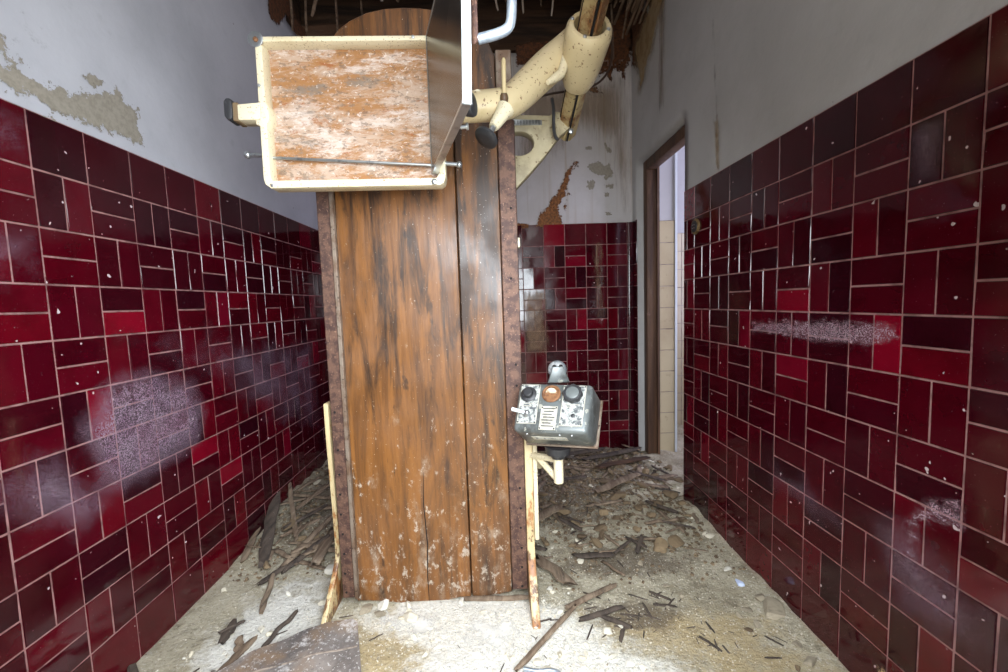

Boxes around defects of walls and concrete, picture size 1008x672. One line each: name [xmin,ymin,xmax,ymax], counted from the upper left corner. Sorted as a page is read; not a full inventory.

flaking render [0,33,145,147]
flaking render [268,0,306,36]
flaking render [514,40,550,67]
flaking render [589,0,651,94]
leakage [95,380,196,478]